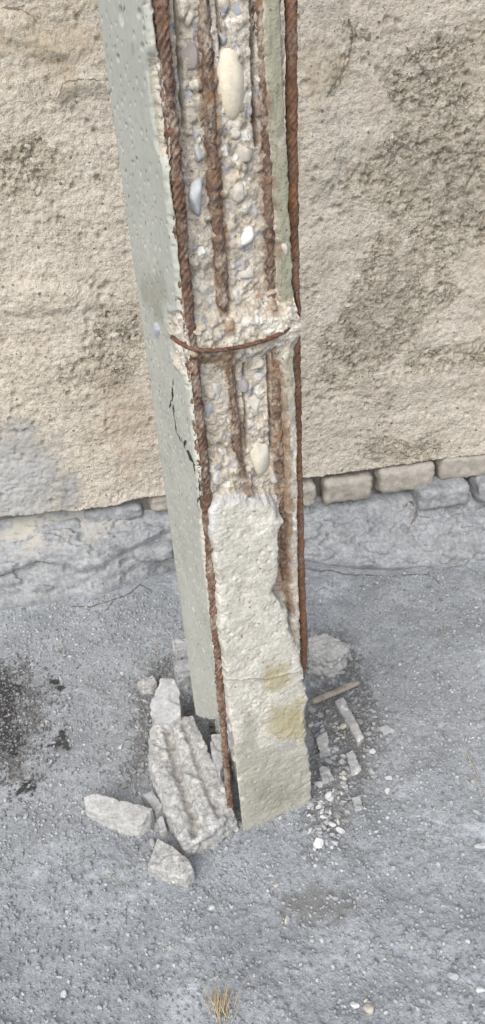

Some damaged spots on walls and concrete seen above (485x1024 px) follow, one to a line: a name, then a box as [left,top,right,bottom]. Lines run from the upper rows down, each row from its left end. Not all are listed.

spalling [56,0,308,813]
crack [169,385,203,511]